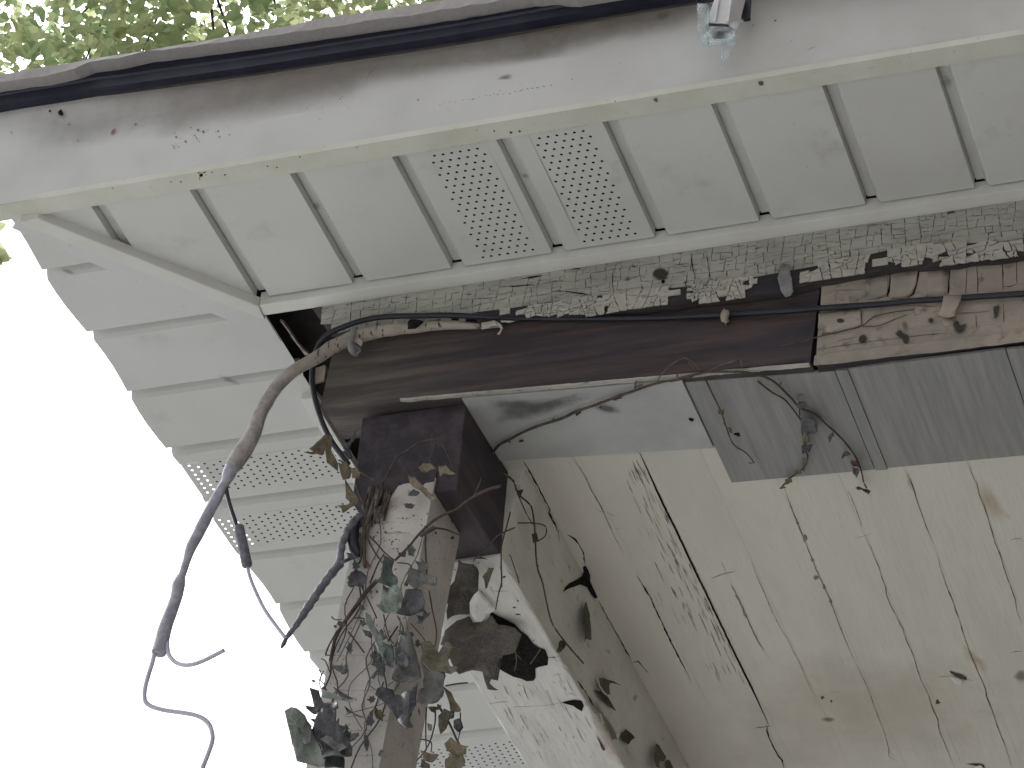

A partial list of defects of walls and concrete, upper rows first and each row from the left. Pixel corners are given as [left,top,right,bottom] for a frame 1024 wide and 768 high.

peeling [408,319,424,329]
peeling [481,276,758,335]
peeling [799,239,1024,334]
crack [969,463,1023,625]
crack [637,576,691,680]
crack [713,561,840,707]
crack [784,488,894,758]
crack [851,497,954,765]